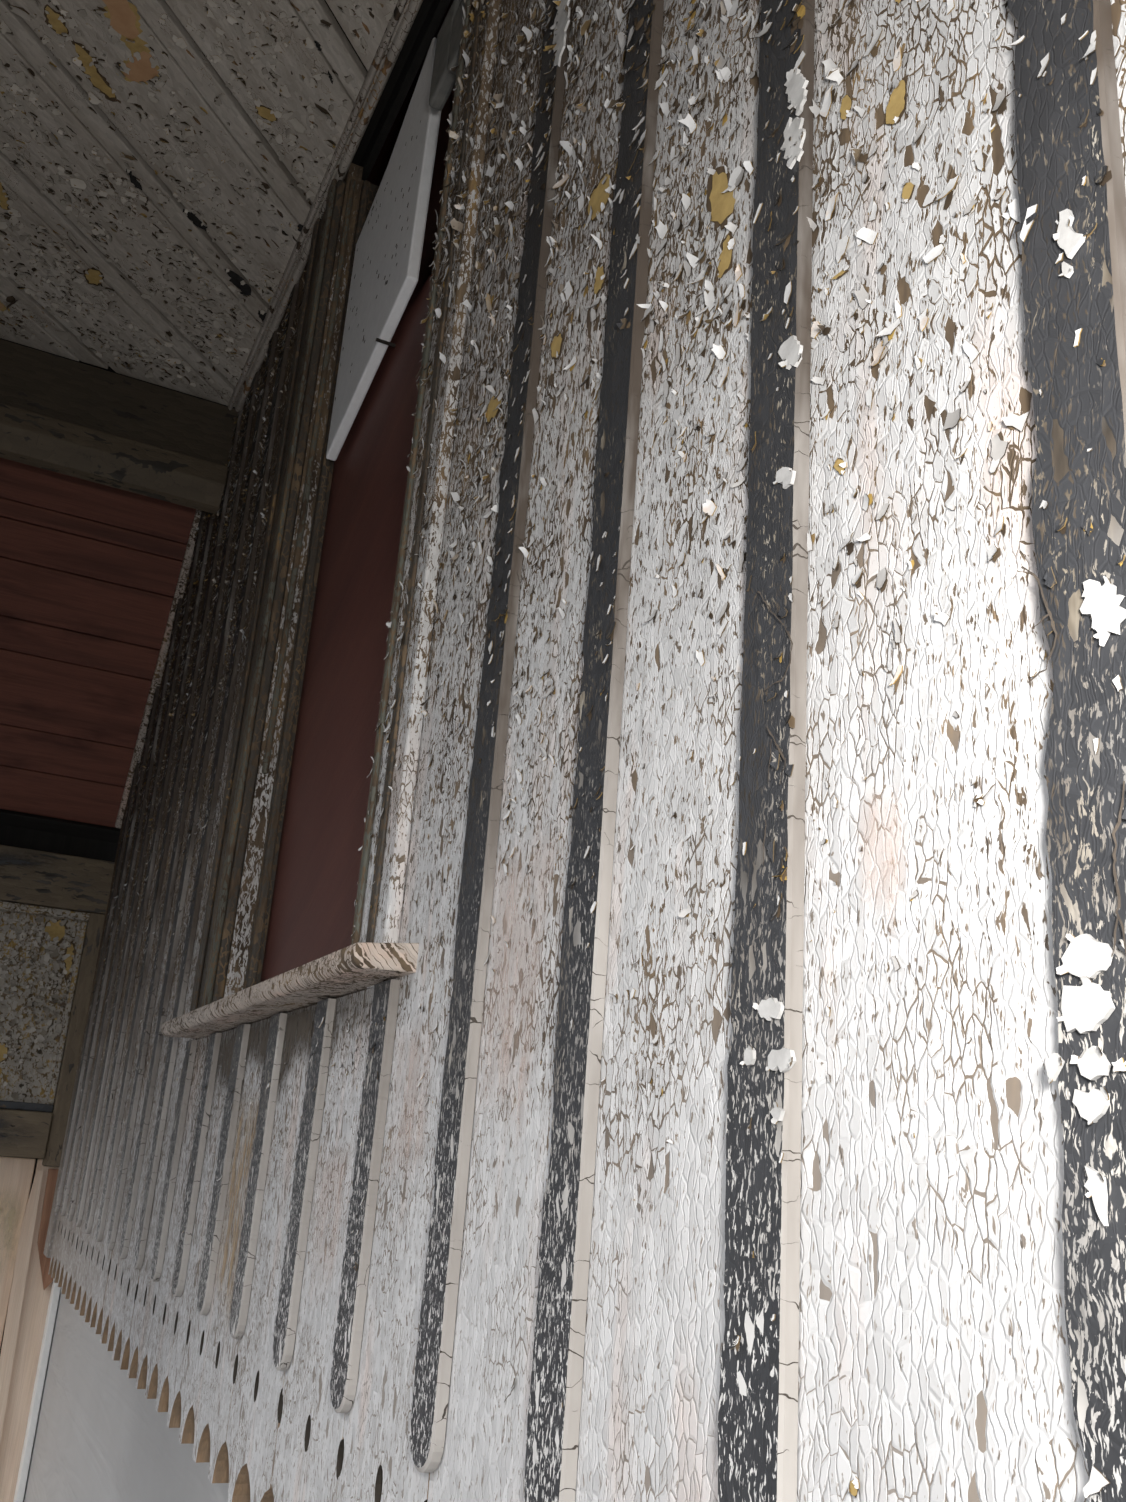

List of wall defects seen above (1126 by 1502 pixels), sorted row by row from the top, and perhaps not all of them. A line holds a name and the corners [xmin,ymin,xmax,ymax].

peeling [1038,53,1055,85]
peeling [1079,30,1098,85]
peeling [1082,165,1112,186]
peeling [1053,219,1097,276]
peeling [350,0,1038,942]
peeling [1112,675,1123,692]
peeling [672,905,732,953]
peeling [1056,963,1092,985]
peeling [639,1035,675,1104]
peeling [1048,1046,1126,1084]
peeling [848,1476,860,1498]
peeling [1083,1466,1110,1498]